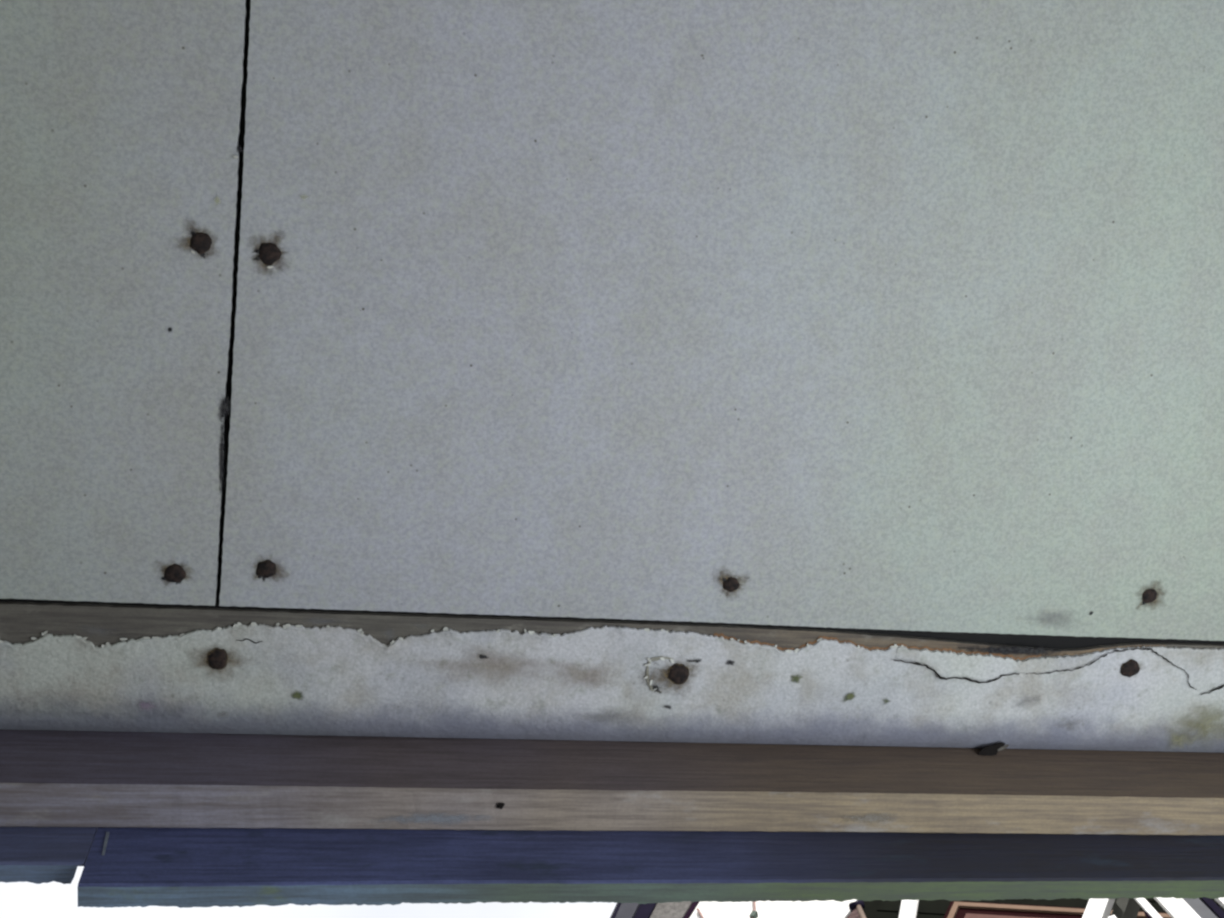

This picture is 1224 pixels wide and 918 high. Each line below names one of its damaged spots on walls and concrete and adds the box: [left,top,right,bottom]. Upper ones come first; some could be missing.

peeling [0,604,1166,660]
spalling [644,656,674,693]
rust [652,659,701,693]
crack [894,648,1224,695]